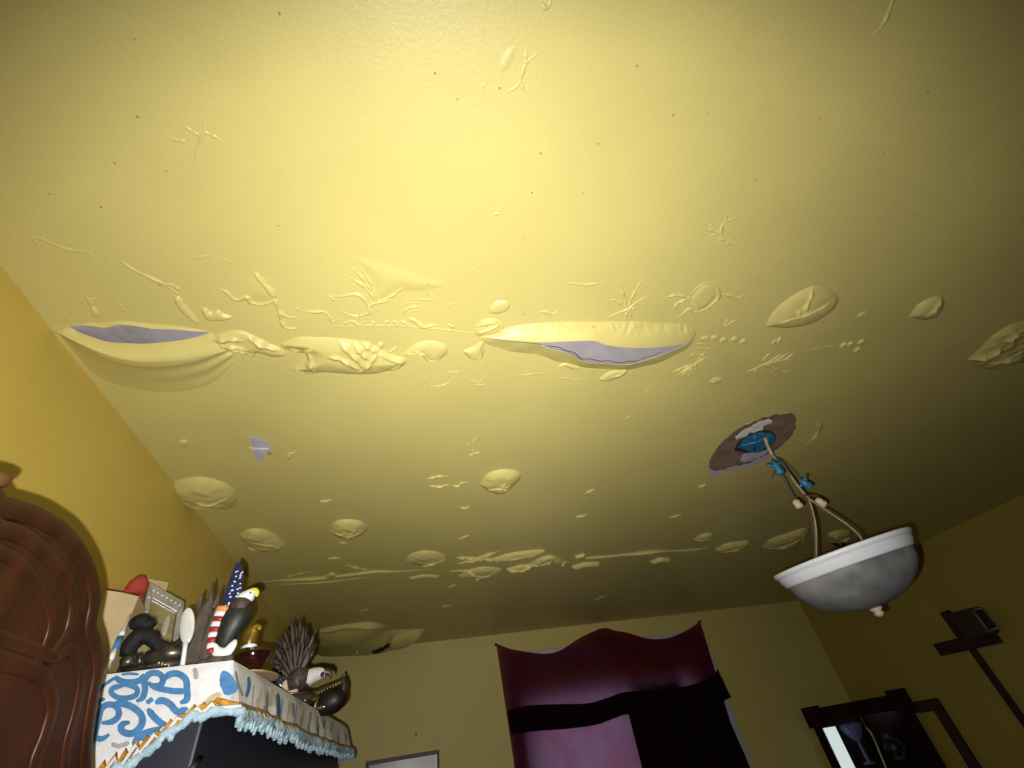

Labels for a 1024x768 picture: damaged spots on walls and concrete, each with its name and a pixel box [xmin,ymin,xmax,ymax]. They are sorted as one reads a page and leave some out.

peeling [52,321,236,392]
peeling [479,321,696,370]
peeling [250,437,272,462]